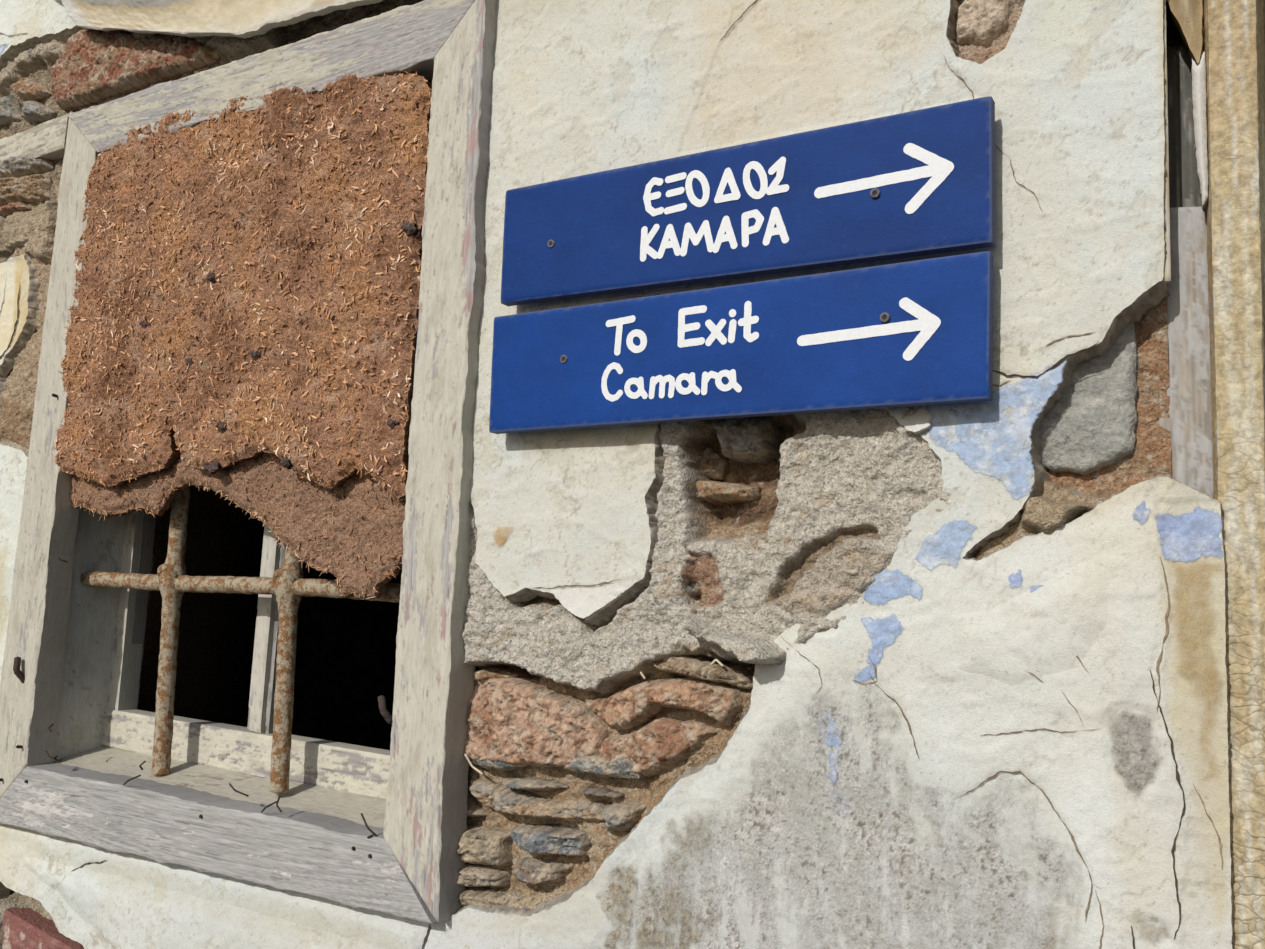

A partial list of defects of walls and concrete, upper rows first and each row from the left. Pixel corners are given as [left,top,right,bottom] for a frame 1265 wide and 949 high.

crack [720,0,758,41]
spalling [956,0,1024,64]
spalling [0,0,424,139]
crack [944,56,974,99]
spalling [0,155,64,449]
crack [992,332,1098,386]
peeling [1133,501,1223,563]
spalling [456,297,1172,949]
crack [984,670,1101,735]
crack [1150,557,1223,939]
crack [953,771,1135,949]
spalling [0,890,84,949]